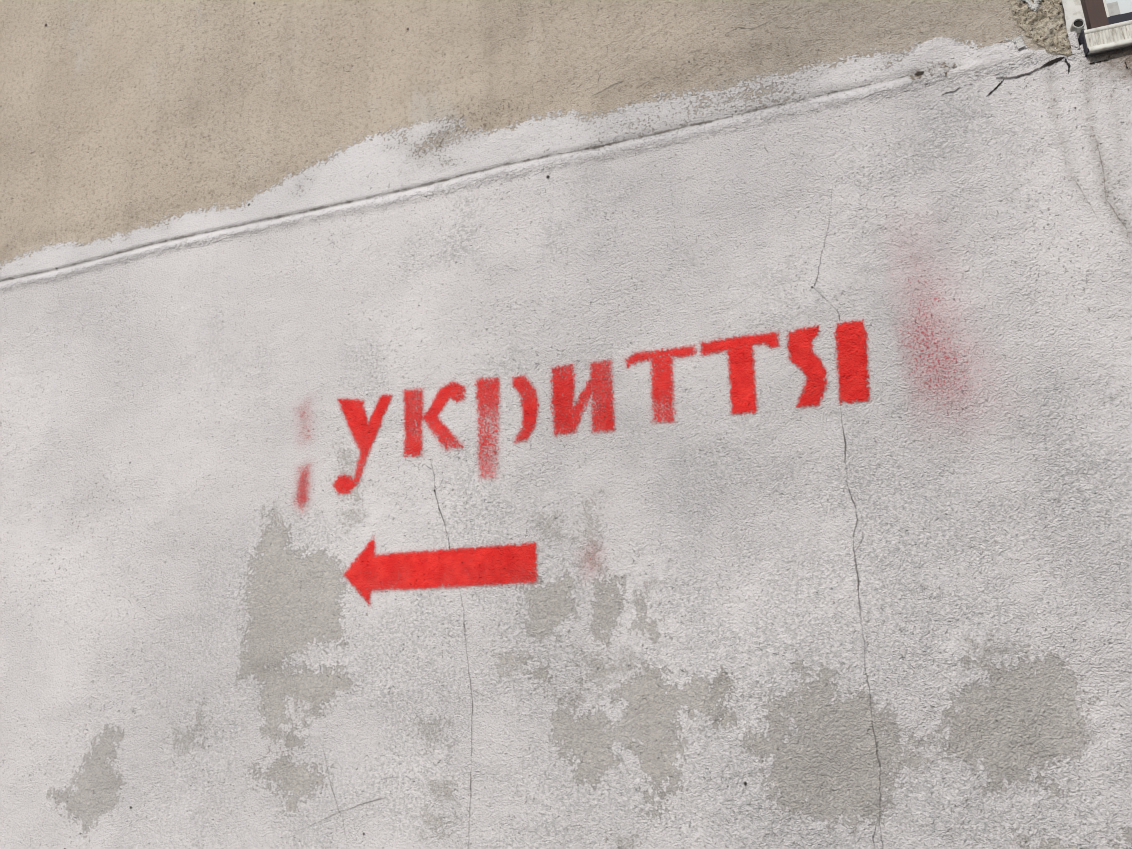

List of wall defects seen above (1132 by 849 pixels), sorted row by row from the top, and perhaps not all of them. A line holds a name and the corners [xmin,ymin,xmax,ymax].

crack [942,54,1128,97]